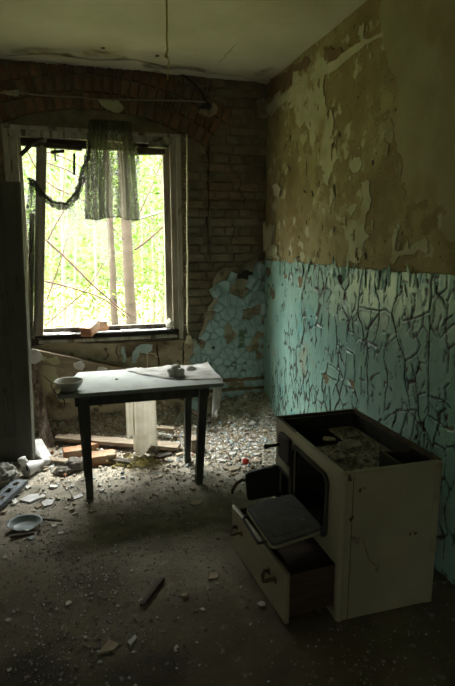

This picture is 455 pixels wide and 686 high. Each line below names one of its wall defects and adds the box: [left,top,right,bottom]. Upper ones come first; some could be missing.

peeling [121,344,153,364]
peeling [189,147,455,585]
crack [301,272,453,448]